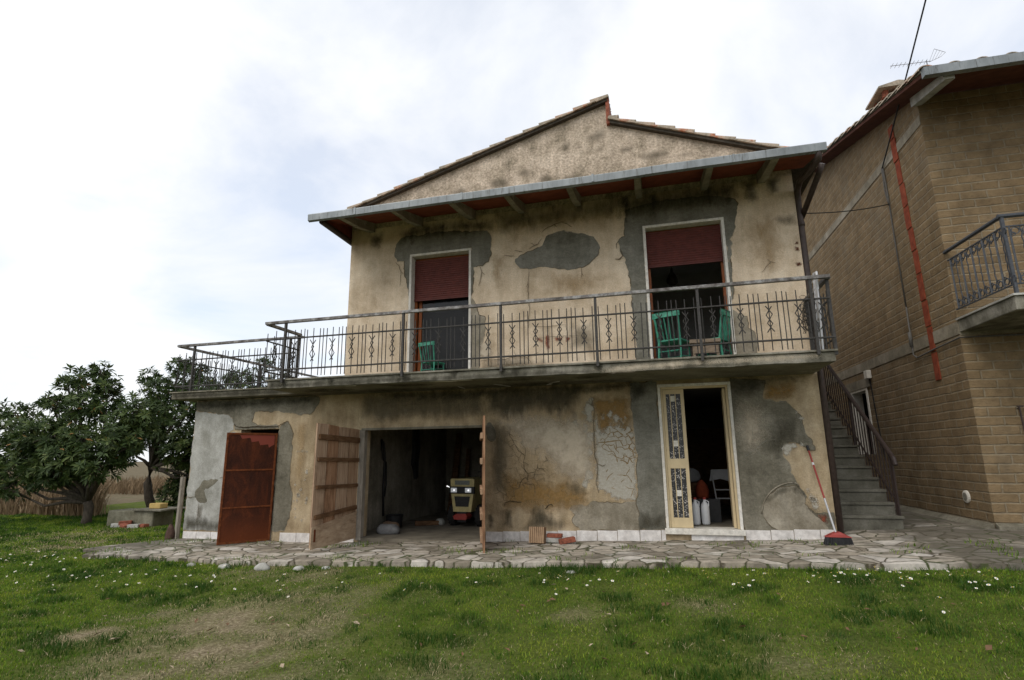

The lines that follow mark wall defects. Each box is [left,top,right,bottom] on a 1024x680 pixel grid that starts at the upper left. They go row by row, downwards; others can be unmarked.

peeling [183,411,235,531]
crack [495,429,555,509]
peeling [573,398,637,500]